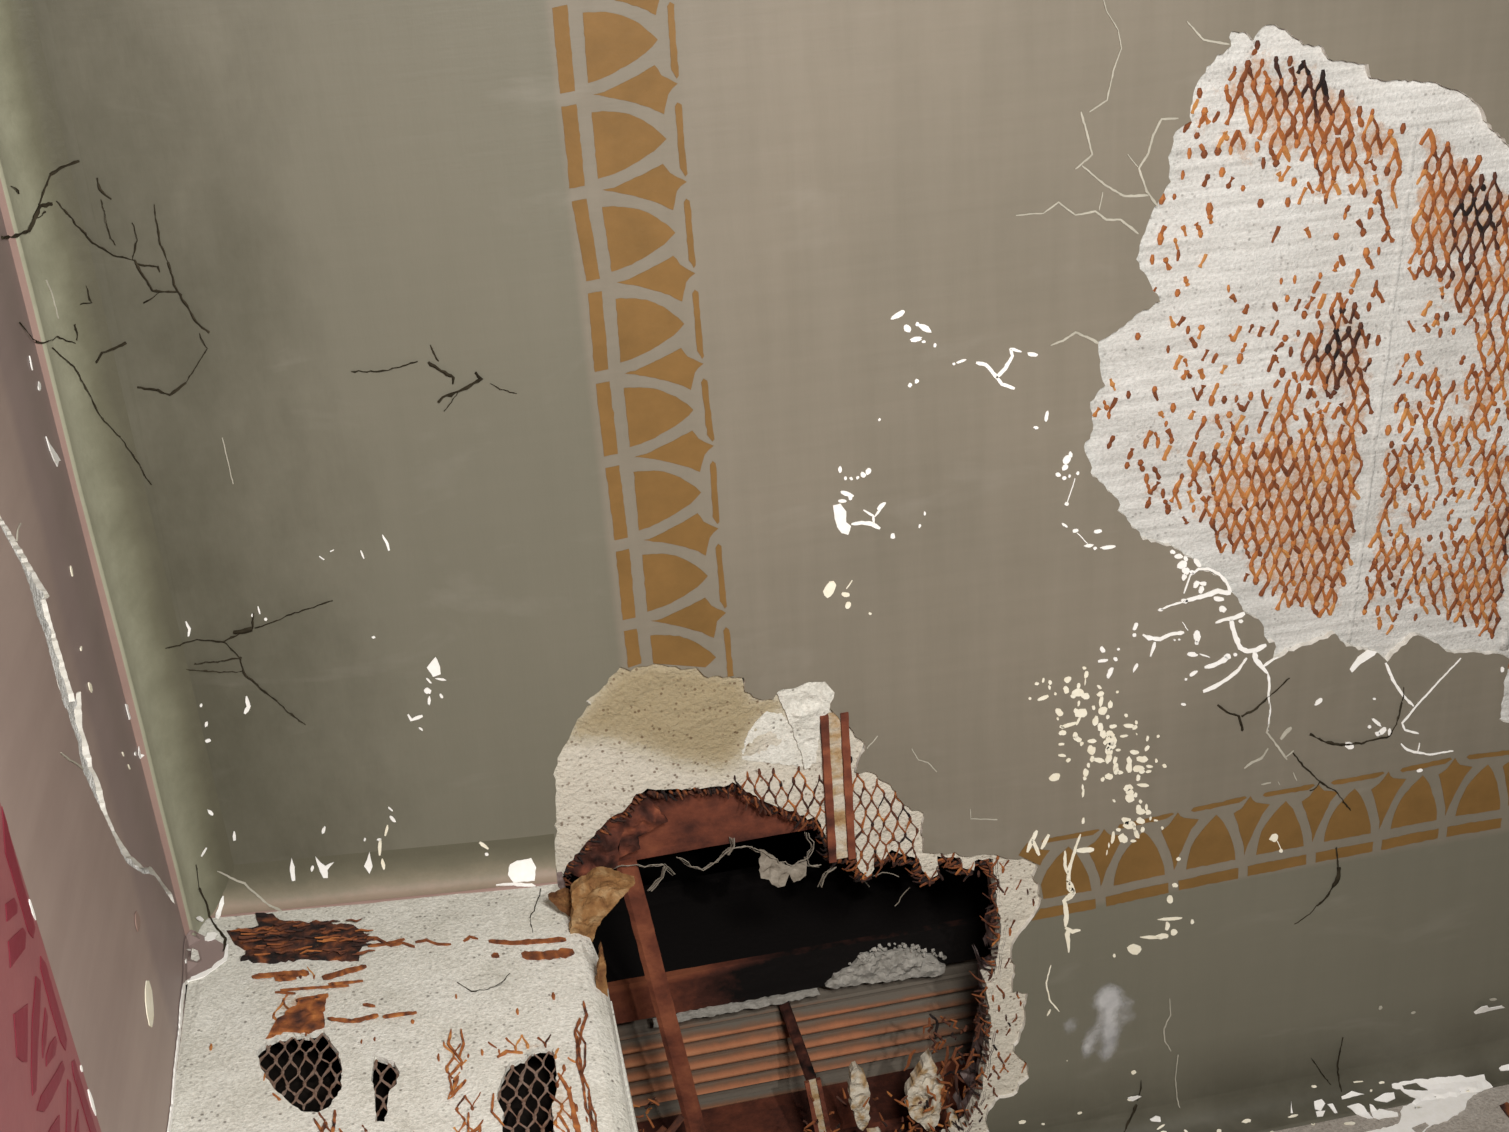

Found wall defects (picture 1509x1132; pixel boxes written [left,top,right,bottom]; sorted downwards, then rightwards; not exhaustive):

crack [1016,0,1179,234]
flaking render [1055,25,1509,721]
crack [1,523,101,809]
crack [1098,550,1322,785]
crack [1345,649,1461,772]
corrosion [566,792,668,877]
corrosion [227,913,575,1039]
spalling [258,1036,342,1092]
corrosion [447,1029,467,1099]
spalling [498,1053,557,1130]
corrosion [557,1072,581,1132]
peeling [1288,1064,1509,1132]